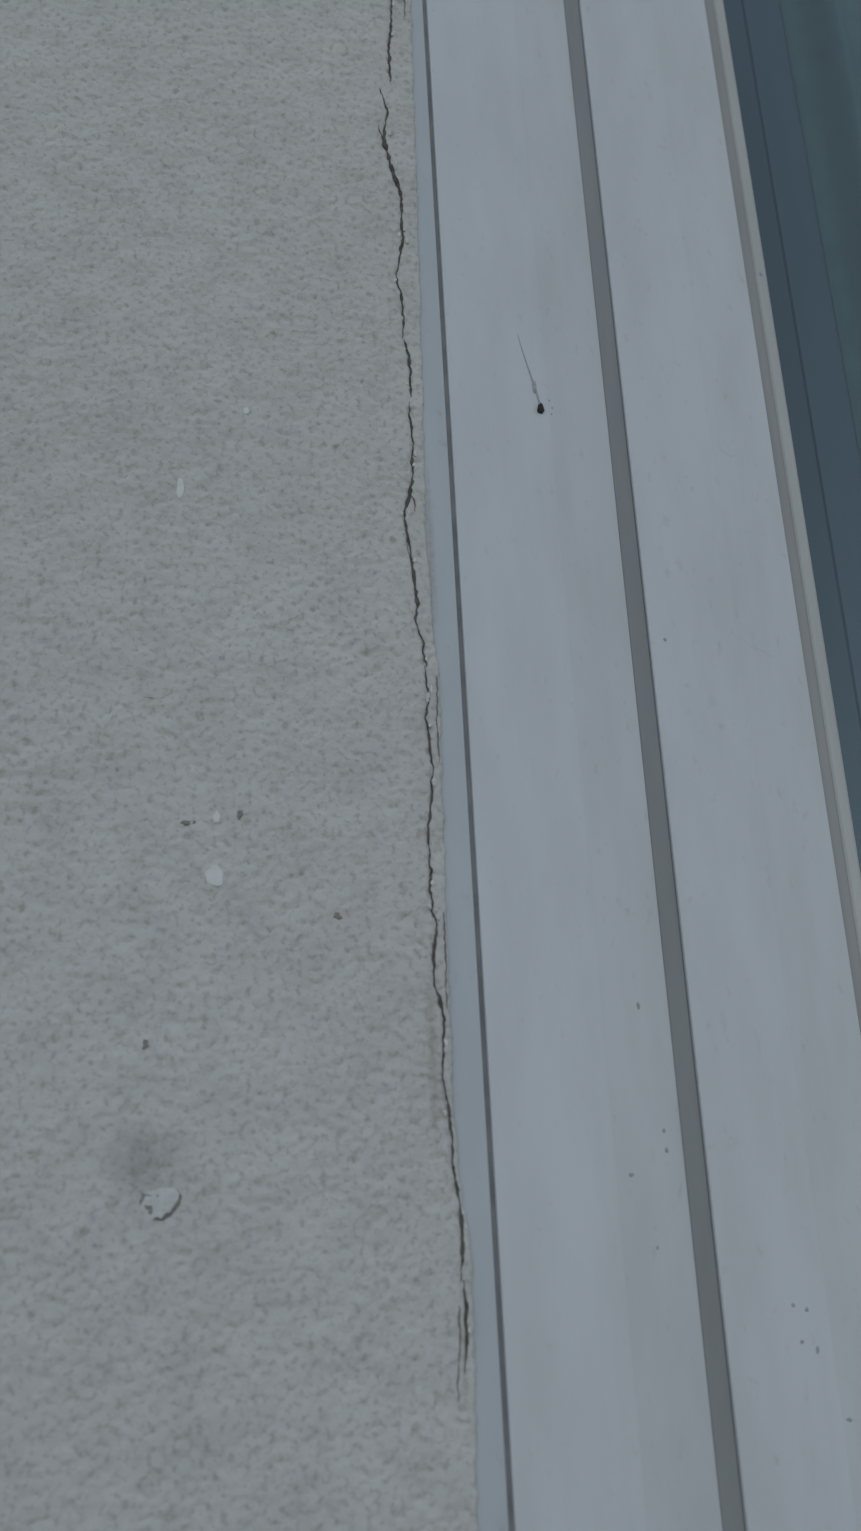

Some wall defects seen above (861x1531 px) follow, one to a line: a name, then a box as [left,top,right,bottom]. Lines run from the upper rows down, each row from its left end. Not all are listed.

crack [378,0,471,1401]